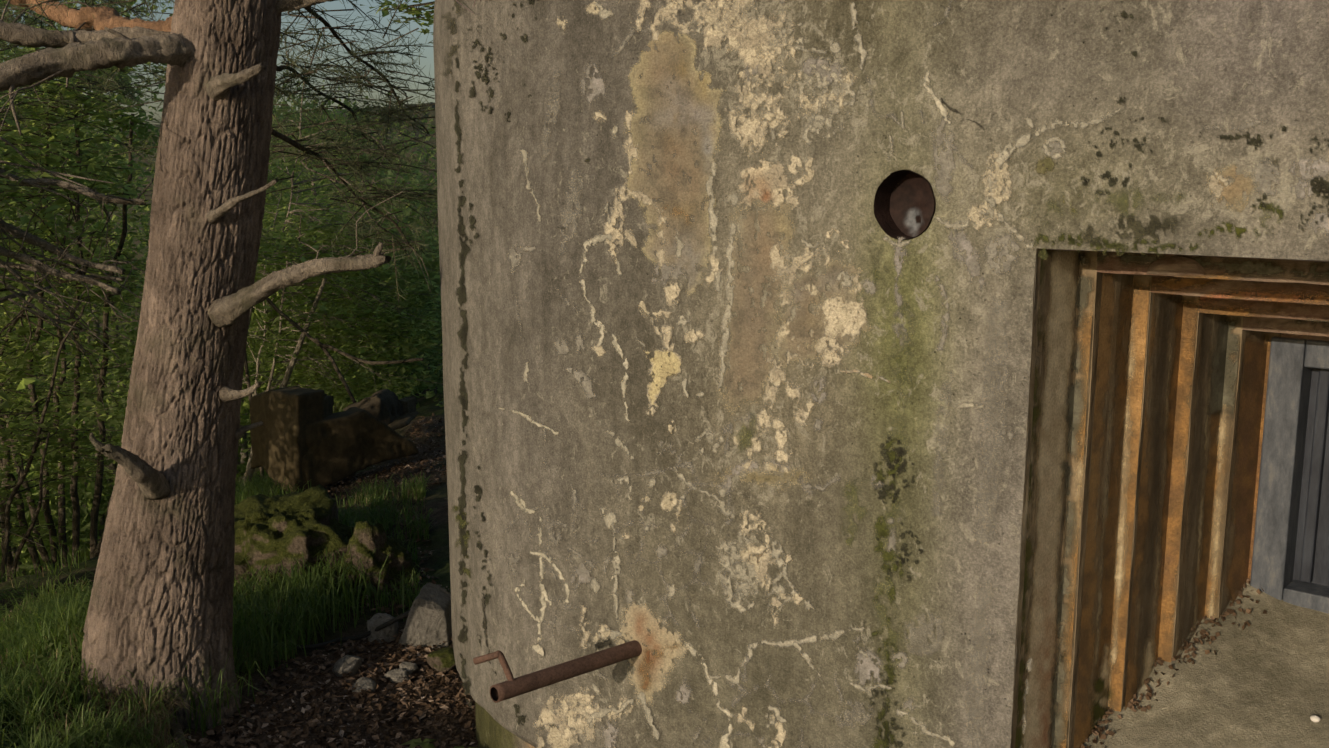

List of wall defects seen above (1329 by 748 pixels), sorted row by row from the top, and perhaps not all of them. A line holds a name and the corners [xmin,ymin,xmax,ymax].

peeling [586,2,613,19]
water stain [581,63,618,137]
water stain [949,188,1329,288]
water stain [555,334,596,399]
peeling [591,0,890,626]
water stain [863,237,915,398]
spalling [473,485,491,646]
peeling [513,687,618,748]
peeling [564,604,590,648]
rust [588,603,687,740]
water stain [843,414,923,748]
water stain [1015,460,1037,748]